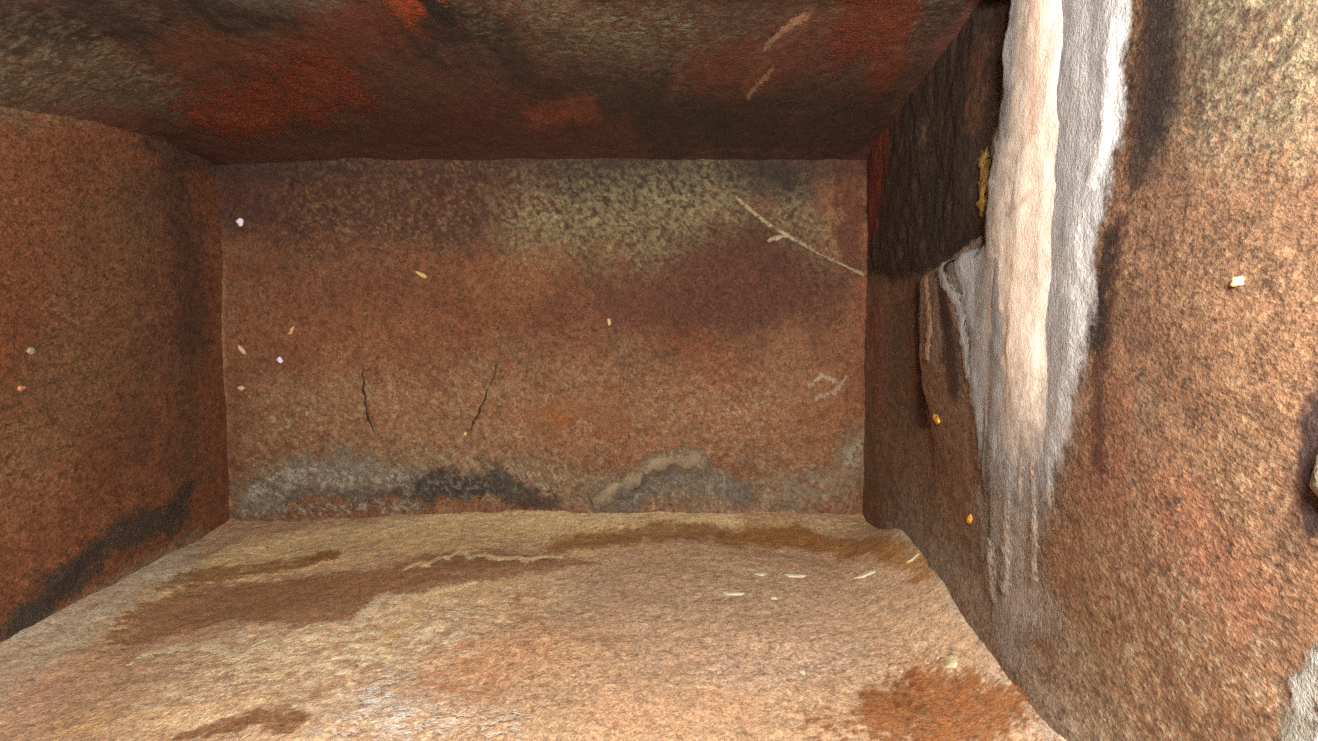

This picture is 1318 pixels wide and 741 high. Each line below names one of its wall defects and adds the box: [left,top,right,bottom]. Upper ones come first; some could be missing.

corrosion [383,0,454,26]
spalling [866,0,1010,428]
crack [361,369,373,430]
crack [470,362,498,431]
water stain [231,447,560,521]
water stain [0,482,195,640]
peeling [851,568,876,580]
water stain [29,521,724,741]
corrosion [794,657,1058,741]